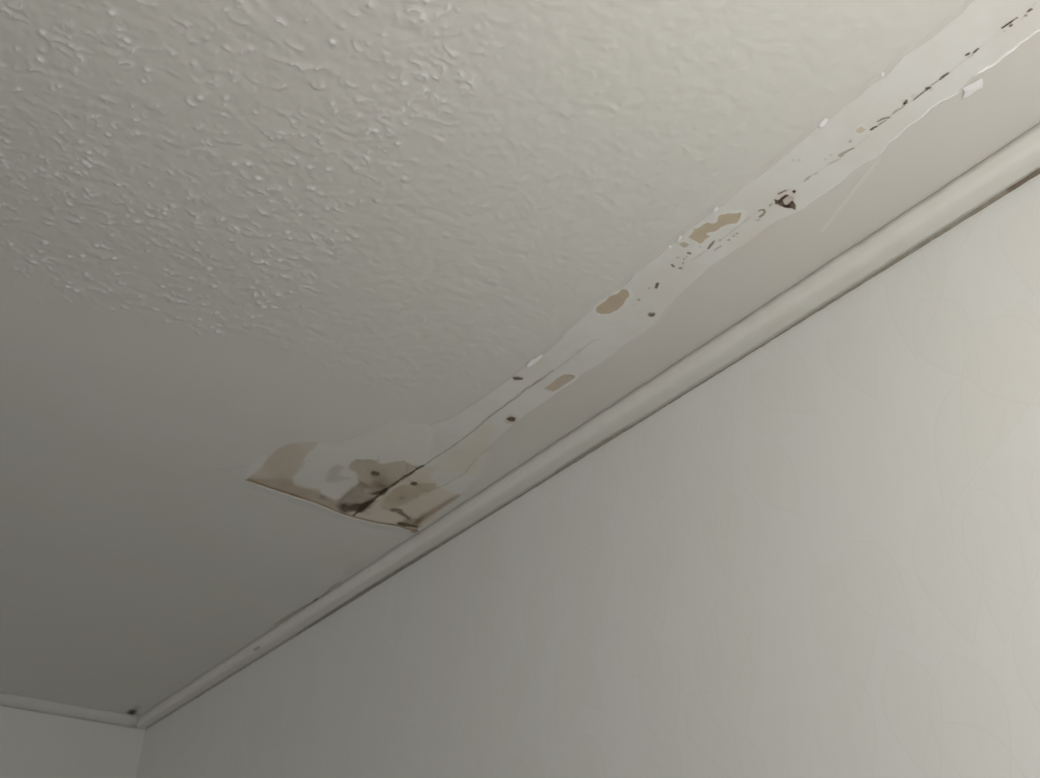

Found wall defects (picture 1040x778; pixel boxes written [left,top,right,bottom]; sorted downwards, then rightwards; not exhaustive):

leakage [240,426,494,533]
crack [146,168,1040,729]
peeling [287,0,1040,499]